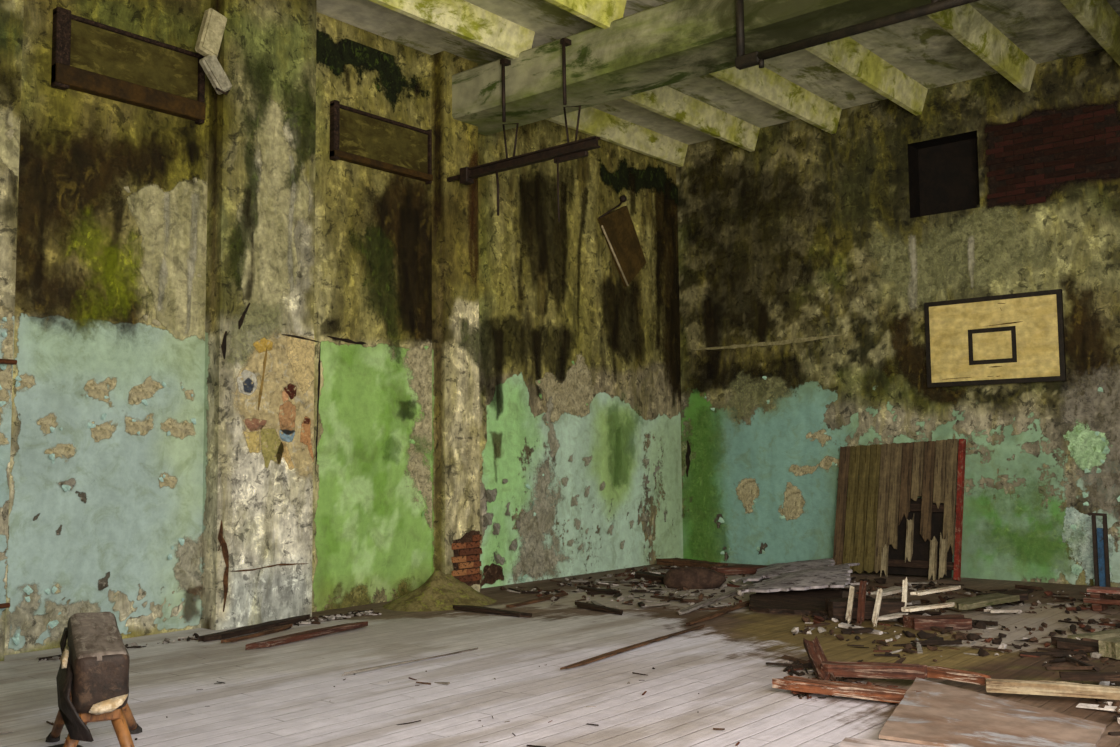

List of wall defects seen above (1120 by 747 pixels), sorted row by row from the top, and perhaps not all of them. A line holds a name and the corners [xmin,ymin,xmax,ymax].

water stain [10,121,199,329]
rust [469,151,479,277]
water stain [519,166,588,316]
flaking render [874,100,1120,311]
peeling [82,376,196,442]
water stain [460,316,575,418]
peeling [451,354,605,587]
water stain [884,313,964,404]
water stain [1062,274,1117,383]
flaking render [1061,366,1120,585]
peeling [7,572,110,645]
peeling [168,536,202,602]